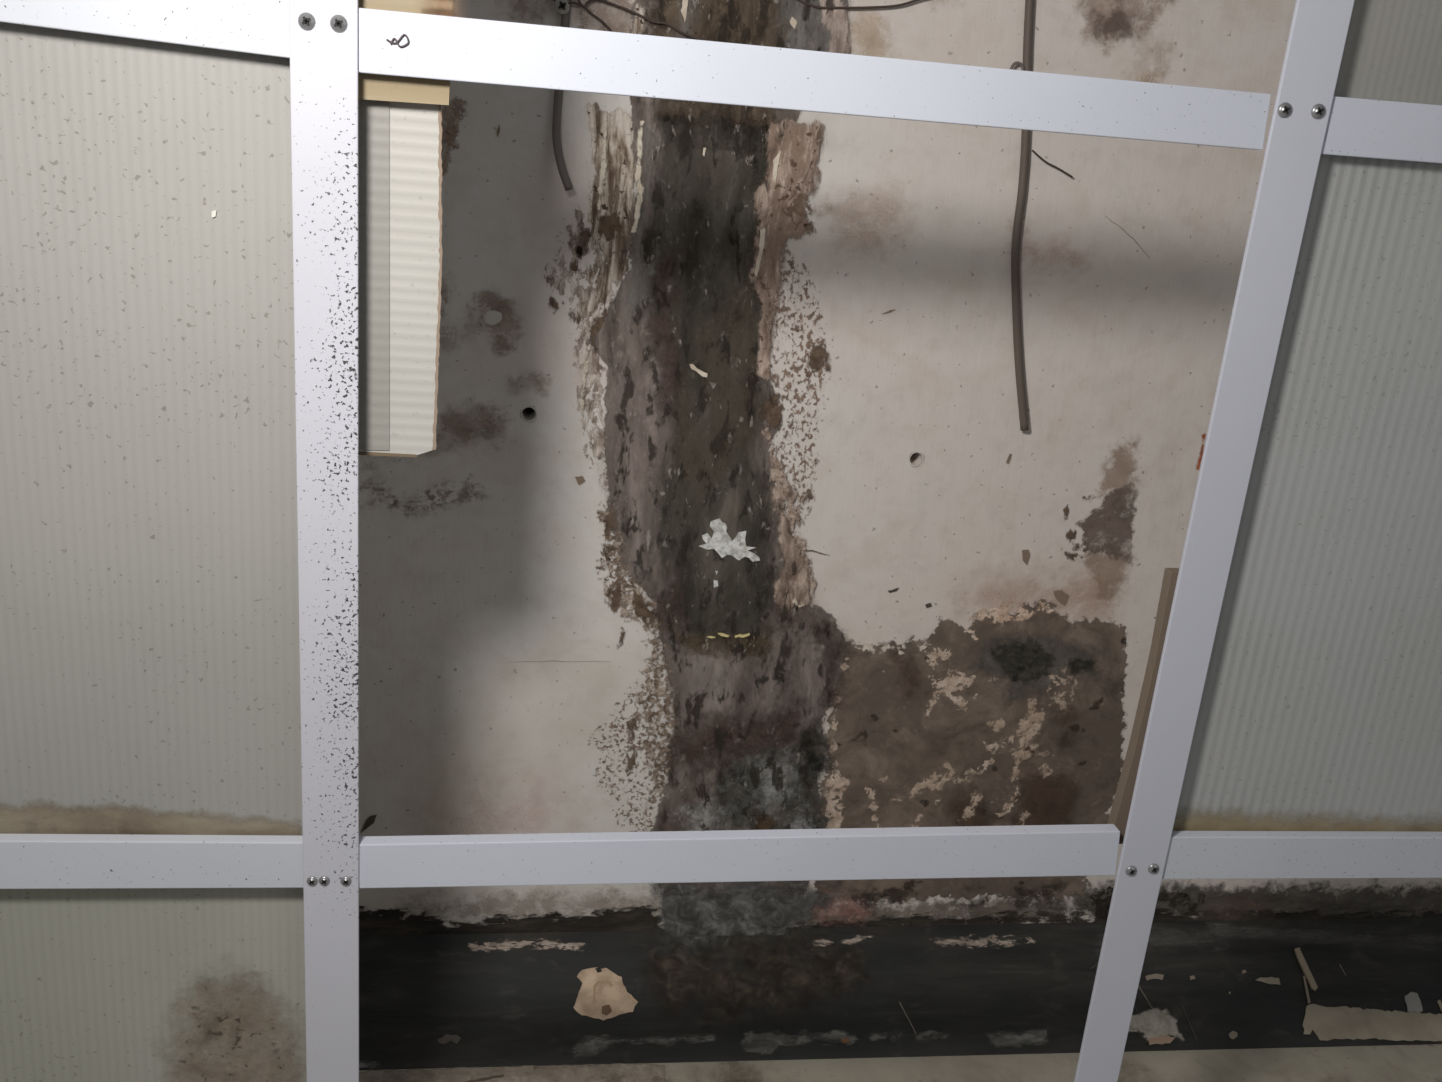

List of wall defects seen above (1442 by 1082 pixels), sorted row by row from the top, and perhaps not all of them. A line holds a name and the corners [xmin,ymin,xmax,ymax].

water stain [578,0,630,33]
spalling [630,0,850,54]
water stain [1083,0,1170,45]
water stain [442,99,467,176]
water stain [469,292,518,353]
spalling [544,96,1128,832]
peeling [658,876,1088,905]
water stain [172,981,297,1082]
peeling [573,967,638,1021]
peeling [1242,970,1280,985]
peeling [1303,992,1442,1042]